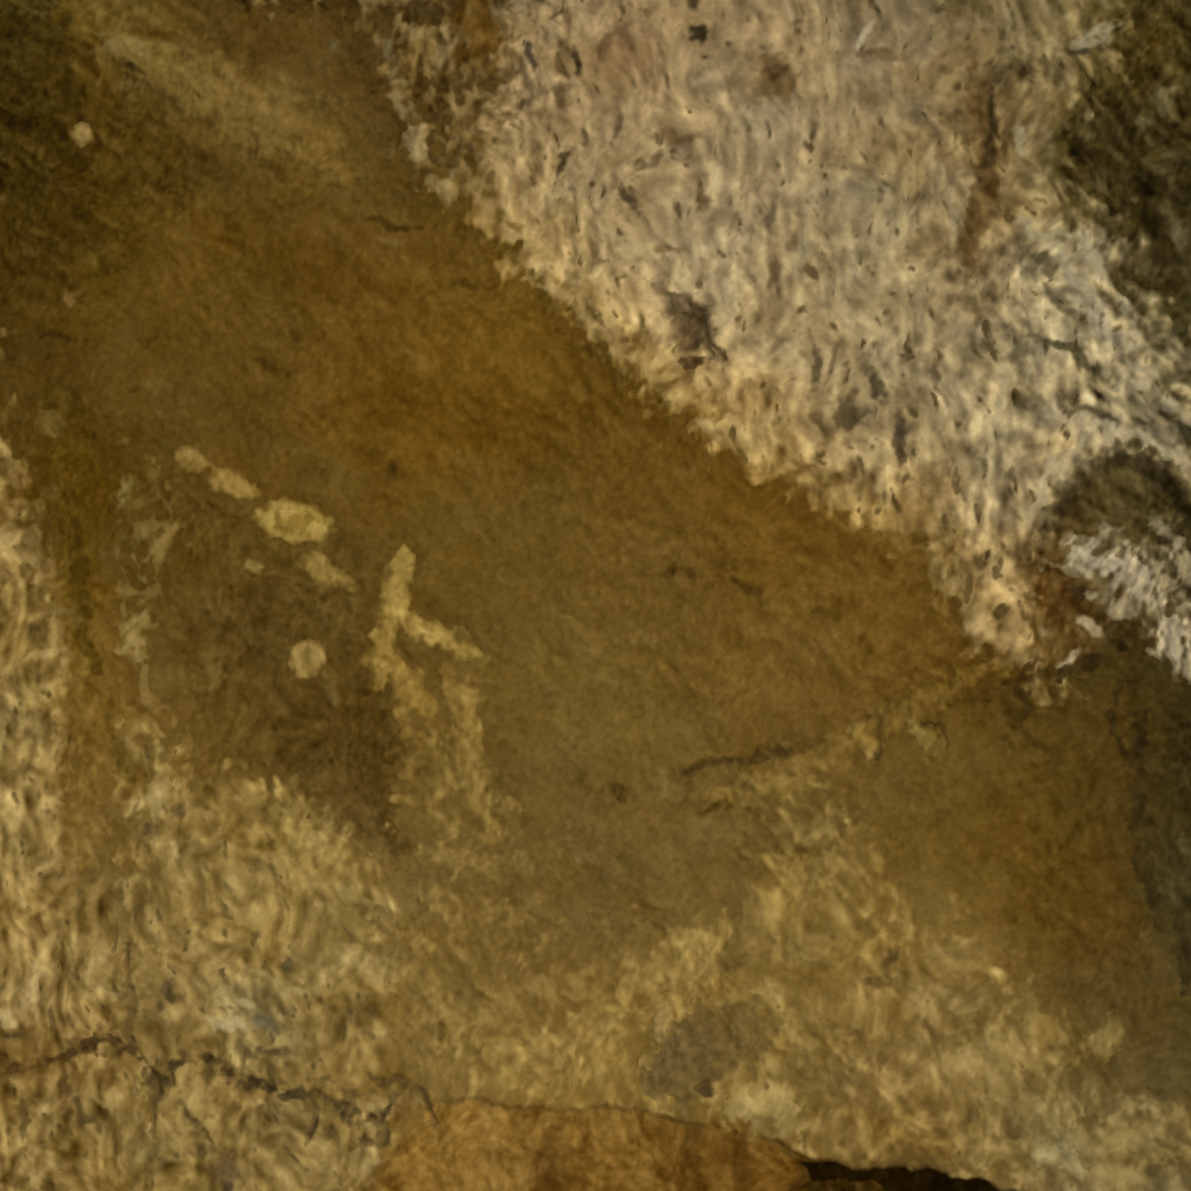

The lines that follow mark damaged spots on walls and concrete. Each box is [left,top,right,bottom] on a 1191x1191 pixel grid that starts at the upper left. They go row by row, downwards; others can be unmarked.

crack [0,940,438,1162]